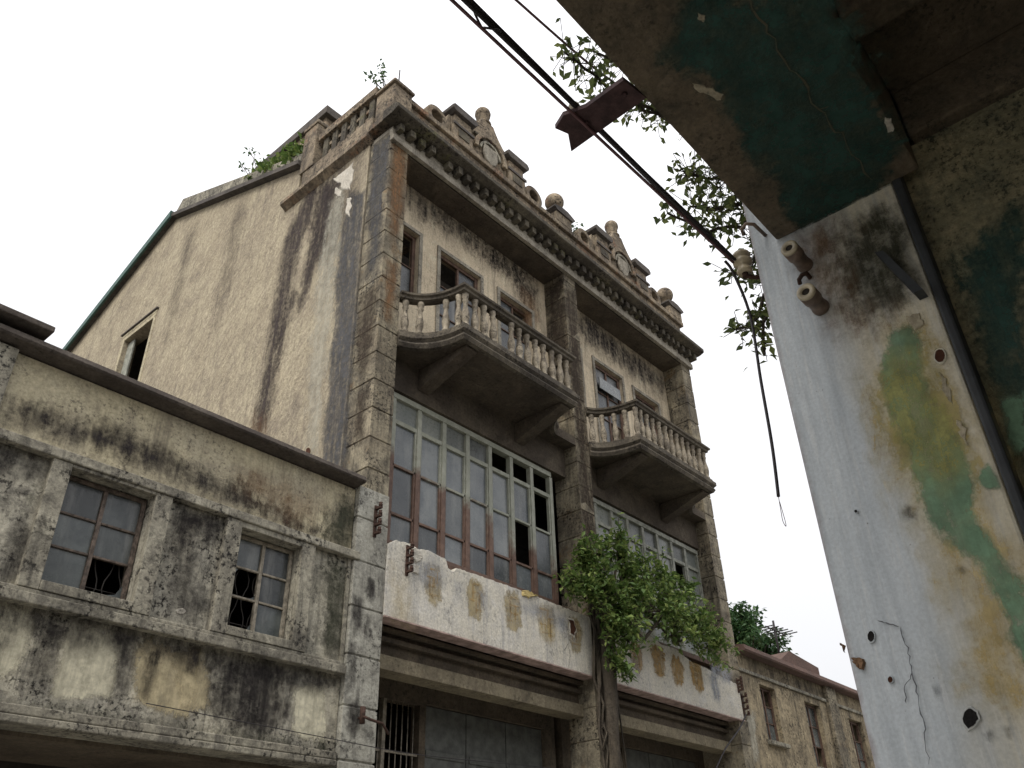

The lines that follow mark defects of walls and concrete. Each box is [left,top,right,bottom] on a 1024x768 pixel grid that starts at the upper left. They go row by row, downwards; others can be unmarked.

flaking render [333,161,355,217]
flaking render [692,83,724,100]
damp [655,0,916,312]
damp [254,135,390,467]
damp [406,186,664,550]
damp [8,402,355,547]
spalling [412,547,423,575]
damp [0,605,335,741]
crack [877,620,930,764]